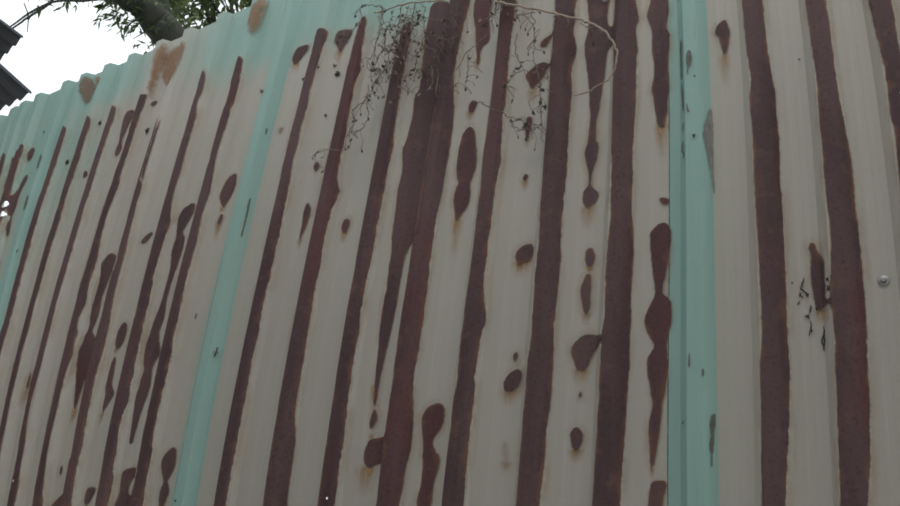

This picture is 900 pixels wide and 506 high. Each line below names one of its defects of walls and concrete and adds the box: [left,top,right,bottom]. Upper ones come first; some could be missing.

rust [0,43,243,506]
rust [214,16,366,506]
rust [317,0,516,506]
rust [504,0,672,506]
rust [742,0,790,506]
rust [805,0,871,506]
rust [868,0,900,179]